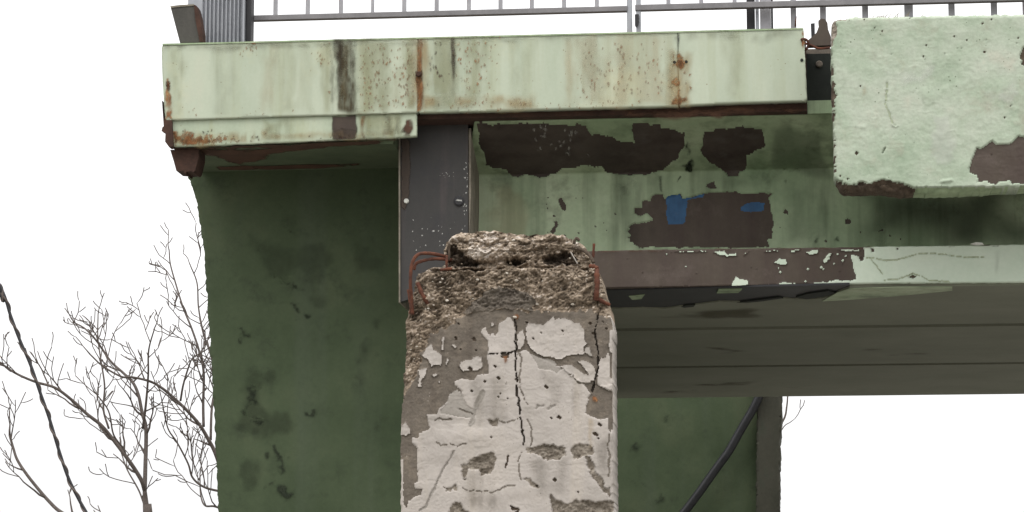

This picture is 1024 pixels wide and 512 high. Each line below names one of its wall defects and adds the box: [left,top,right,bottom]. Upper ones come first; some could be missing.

rust [173,39,488,170]
water stain [332,39,357,139]
peeling [477,121,685,178]
rust [577,43,803,119]
peeling [700,125,765,176]
spalling [831,19,847,122]
peeling [833,136,1024,199]
crack [569,315,600,392]
spalling [400,181,874,512]
crack [462,318,533,494]